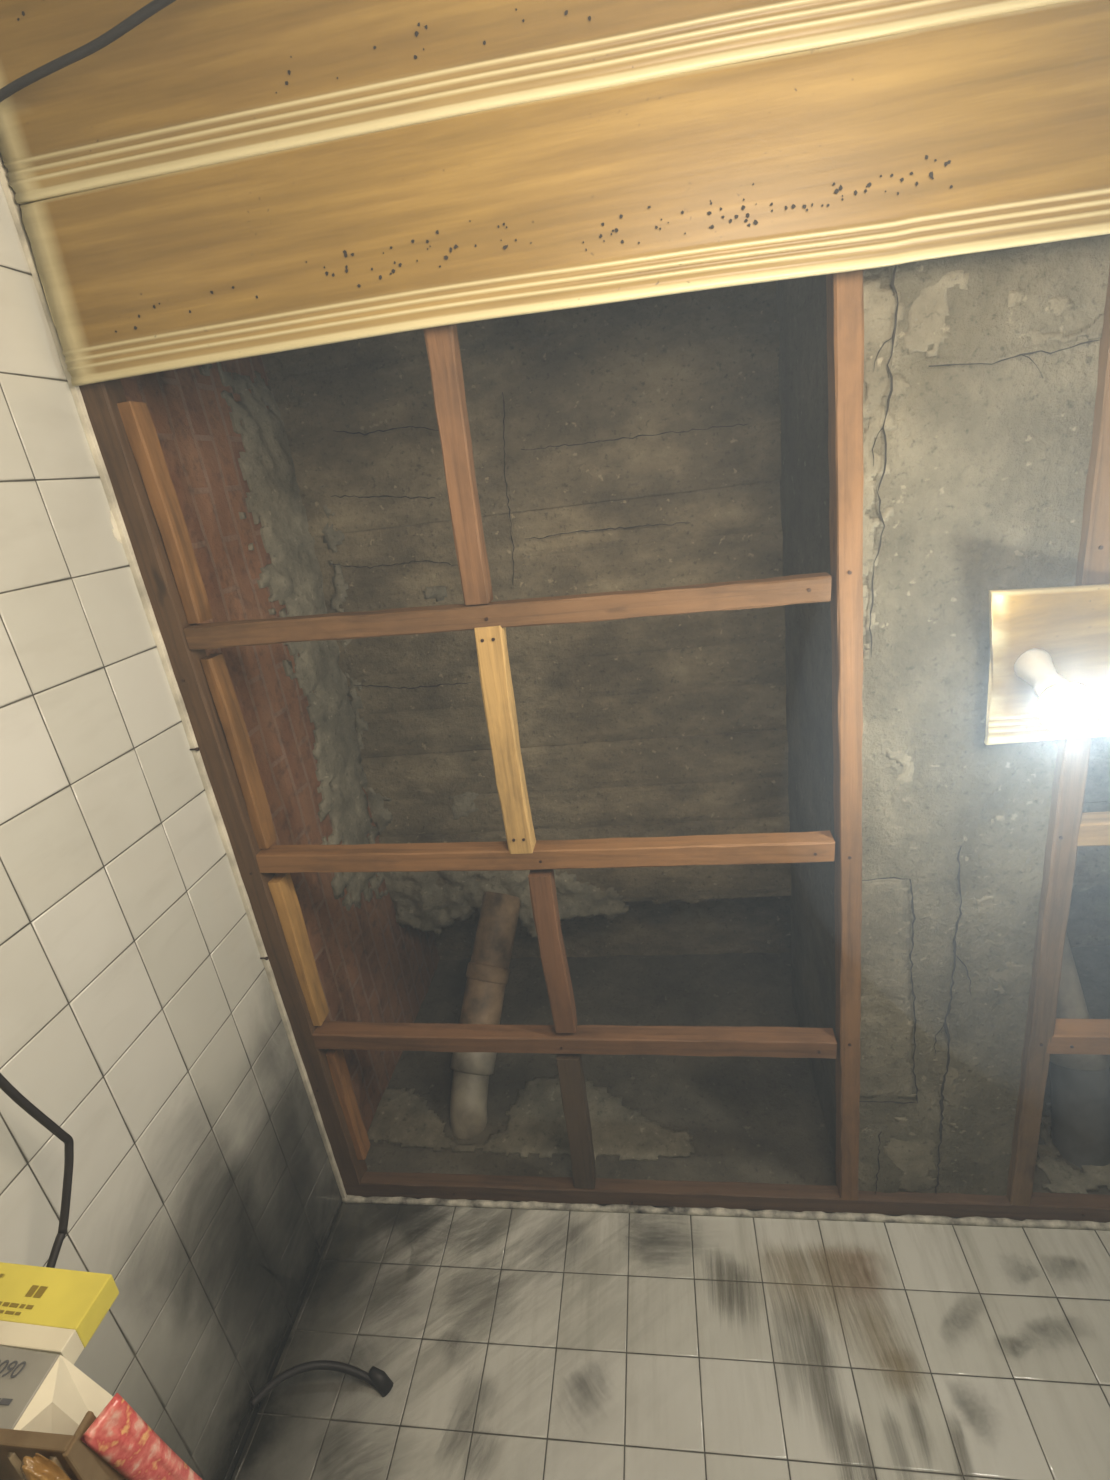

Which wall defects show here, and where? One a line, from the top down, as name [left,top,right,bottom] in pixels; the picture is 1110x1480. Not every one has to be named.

flaking render [199,362,327,618]
flaking render [282,640,379,845]
crack [860,846,971,1195]